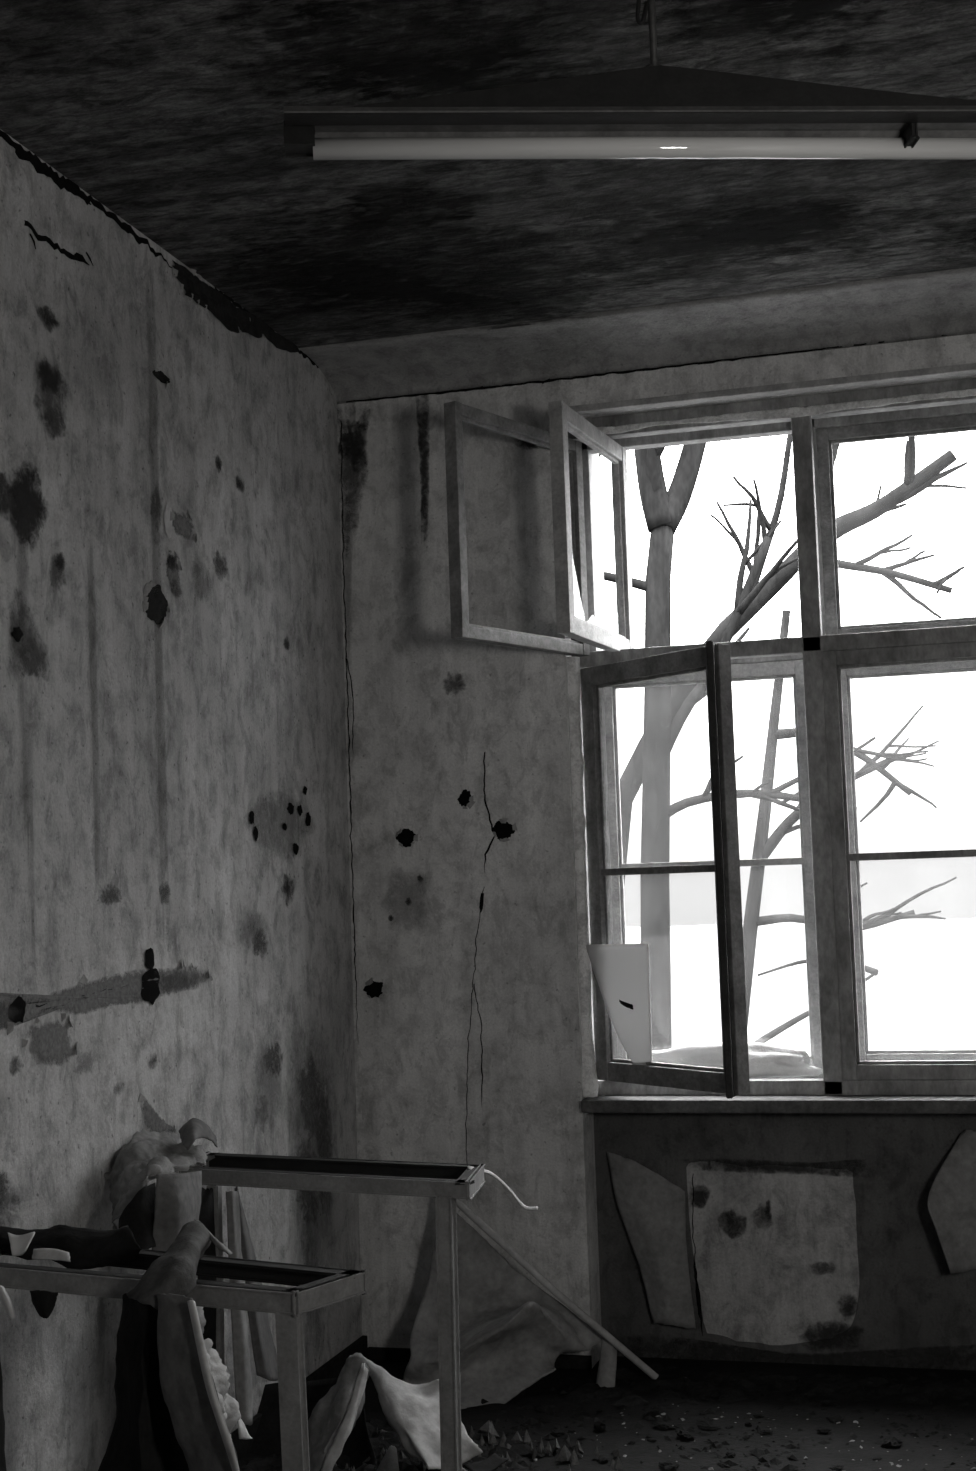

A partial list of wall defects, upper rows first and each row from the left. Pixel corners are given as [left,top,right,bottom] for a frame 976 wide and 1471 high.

crack [0,130,172,268]
crack [215,287,319,368]
leakage [0,463,46,548]
flaking render [142,488,197,629]
leakage [10,593,47,676]